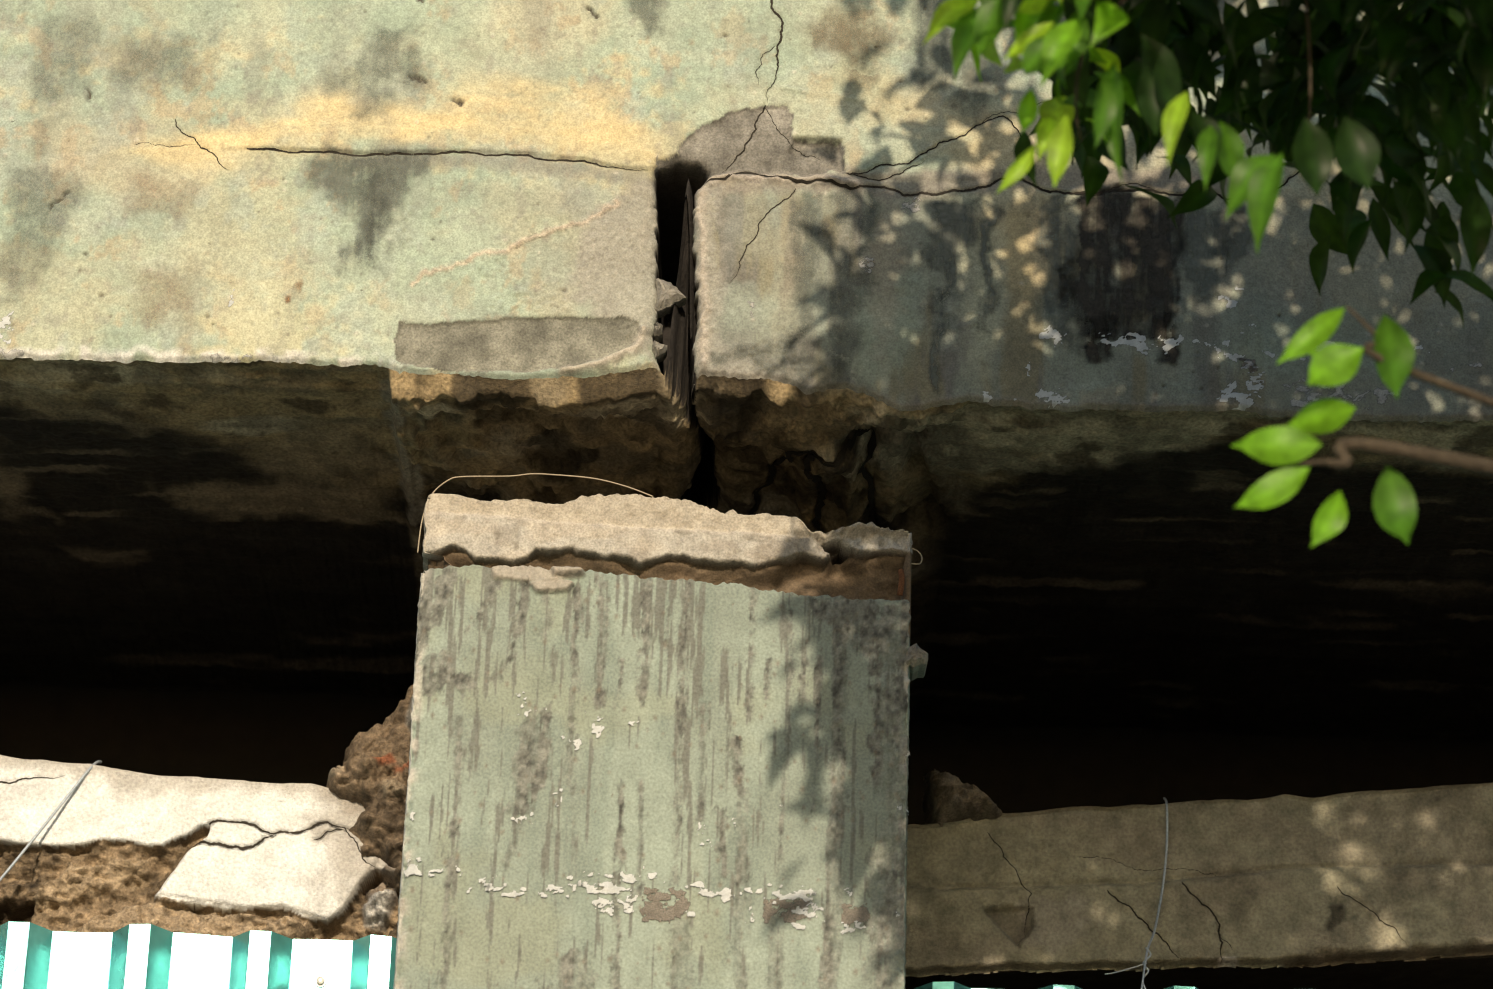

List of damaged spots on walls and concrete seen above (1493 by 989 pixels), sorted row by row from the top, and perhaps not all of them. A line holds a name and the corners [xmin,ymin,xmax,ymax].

damp [1036,184,1252,364]
spalling [395,317,643,372]
crack [136,0,1228,638]
peeling [1039,325,1067,347]
peeling [1099,323,1335,411]
crack [0,776,61,784]
crack [192,819,376,868]
crack [987,832,1032,935]
crack [1083,856,1232,962]
crack [1337,886,1403,940]